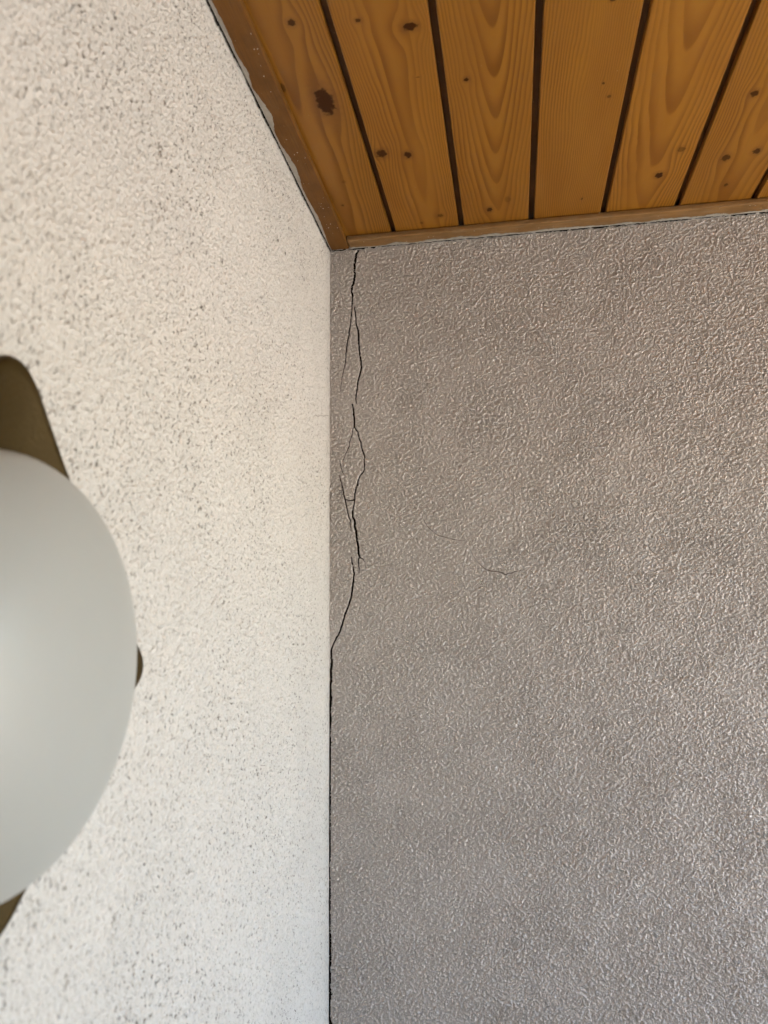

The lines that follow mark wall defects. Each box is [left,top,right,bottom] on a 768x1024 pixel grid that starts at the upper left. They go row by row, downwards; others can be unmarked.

crack [207,0,768,1024]